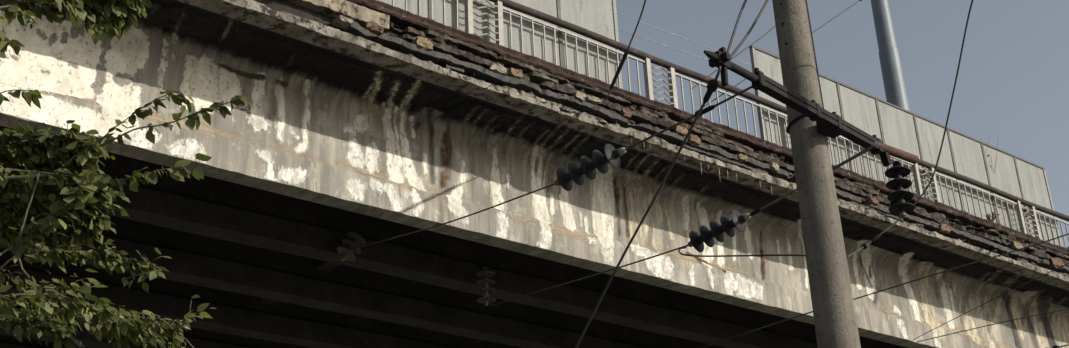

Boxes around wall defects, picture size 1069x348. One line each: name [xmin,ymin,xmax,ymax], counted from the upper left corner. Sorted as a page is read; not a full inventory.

water stain [54,38,111,103]
efflorescence [251,72,311,153]
water stain [340,71,466,204]
spalling [410,36,434,51]
corrosion [441,133,449,187]
spalling [486,63,523,78]
spalling [571,91,602,105]
spalling [671,126,701,145]
water stain [490,125,754,271]
water stain [852,240,878,303]
peeling [893,304,908,339]
water stain [888,252,1066,348]